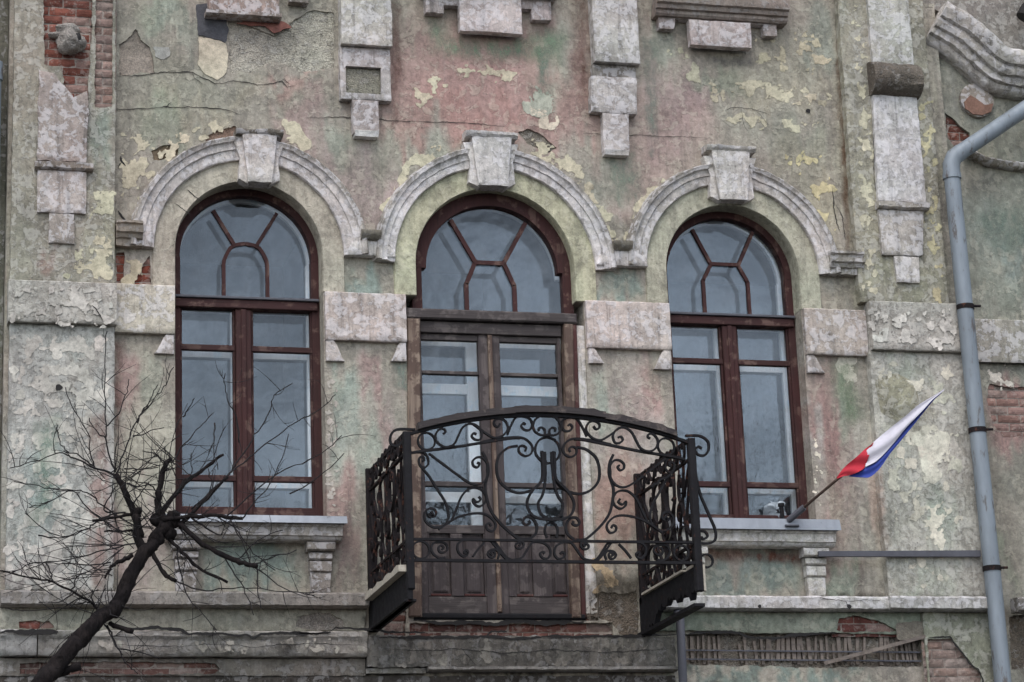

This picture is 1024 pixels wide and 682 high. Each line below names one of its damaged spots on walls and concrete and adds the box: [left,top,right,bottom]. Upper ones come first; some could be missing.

flaking render [43,0,154,114]
crack [119,71,294,115]
peeling [413,76,448,108]
peeling [89,120,236,219]
peeling [518,86,628,241]
peeling [632,178,665,219]
crack [832,190,846,239]
flaking render [918,100,969,173]
peeling [867,187,957,351]
peeling [2,236,151,591]
flaking render [987,363,1024,438]
flaking render [832,616,980,682]